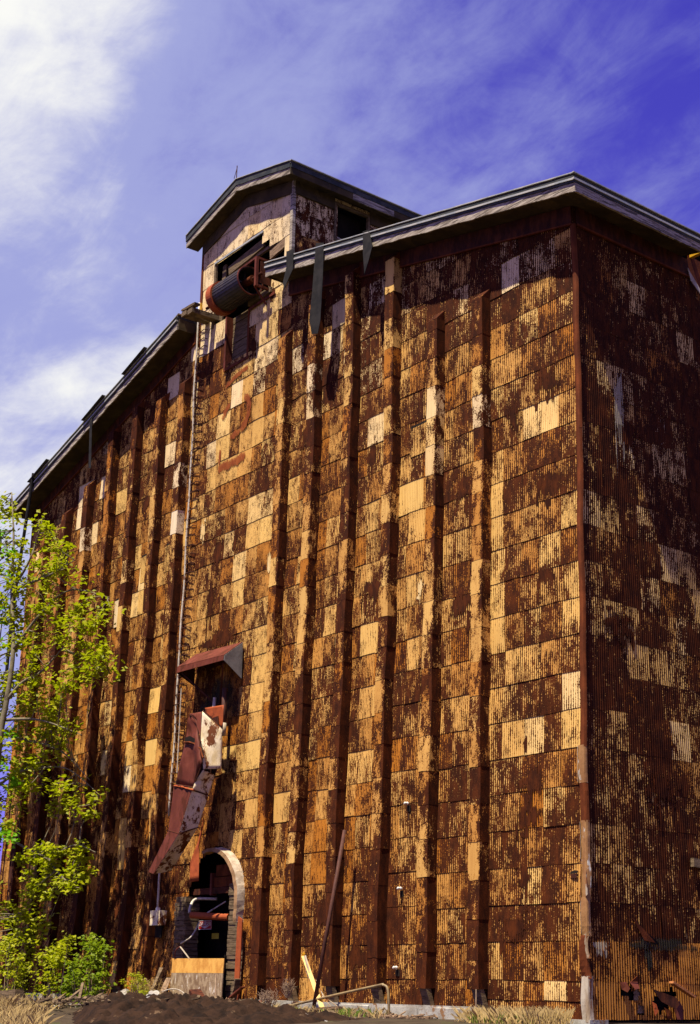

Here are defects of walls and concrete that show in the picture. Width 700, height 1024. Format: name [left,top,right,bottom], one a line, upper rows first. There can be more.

rust [506,361,559,450]
rust [366,441,379,483]
rust [139,493,150,526]
rust [453,468,473,516]
rust [535,469,577,511]
rust [198,531,240,652]
rust [359,573,379,619]
rust [448,590,471,635]
rust [536,562,557,609]
rust [515,764,550,842]
rust [498,861,532,961]
rust [346,938,367,987]